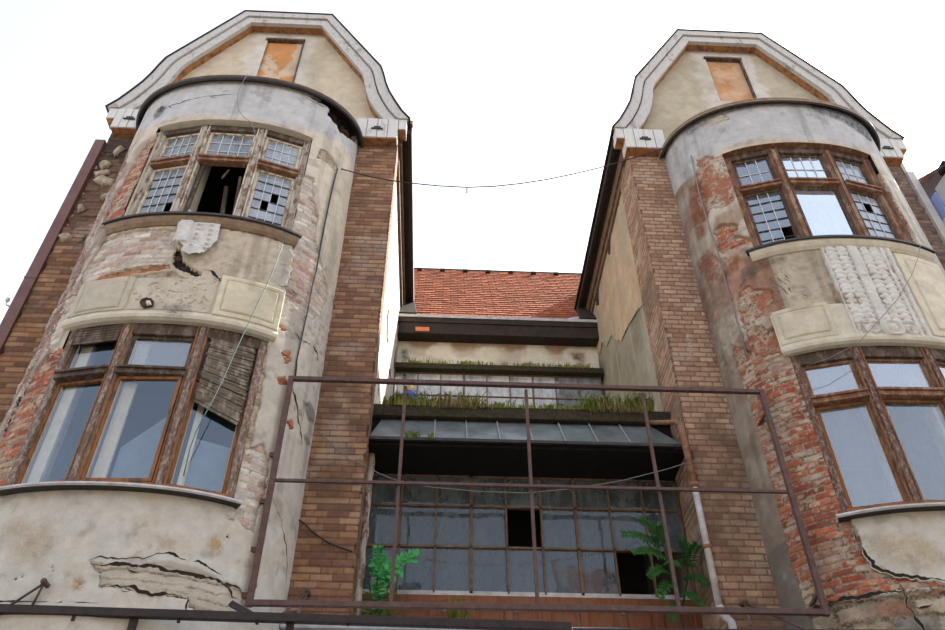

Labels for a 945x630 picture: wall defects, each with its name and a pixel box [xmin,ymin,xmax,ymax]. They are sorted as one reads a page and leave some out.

crack [164,94,229,109]
spalling [696,155,734,219]
spalling [713,224,751,254]
spalling [0,136,201,497]
spalling [733,287,945,630]
spalling [90,561,245,611]